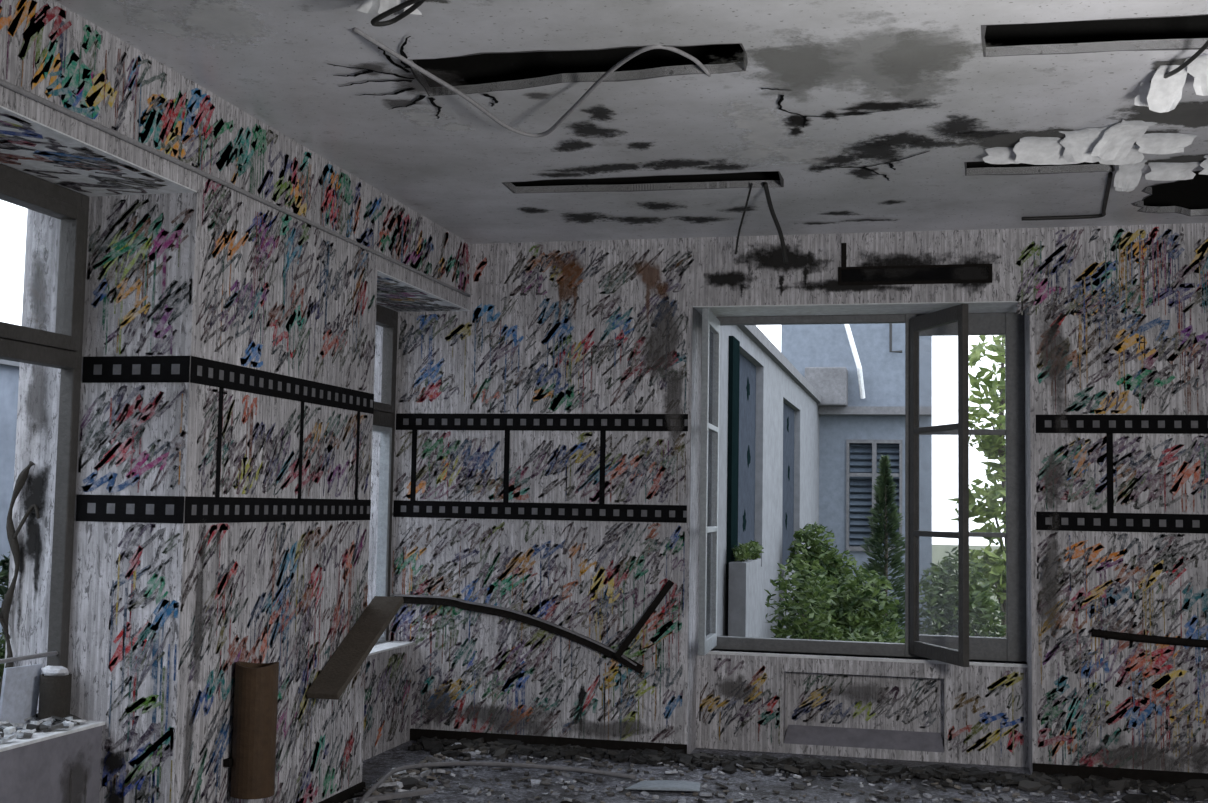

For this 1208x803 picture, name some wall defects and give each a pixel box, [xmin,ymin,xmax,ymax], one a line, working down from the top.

leakage [538,103,1009,179]
peeling [945,55,1208,192]
leakage [17,534,40,637]